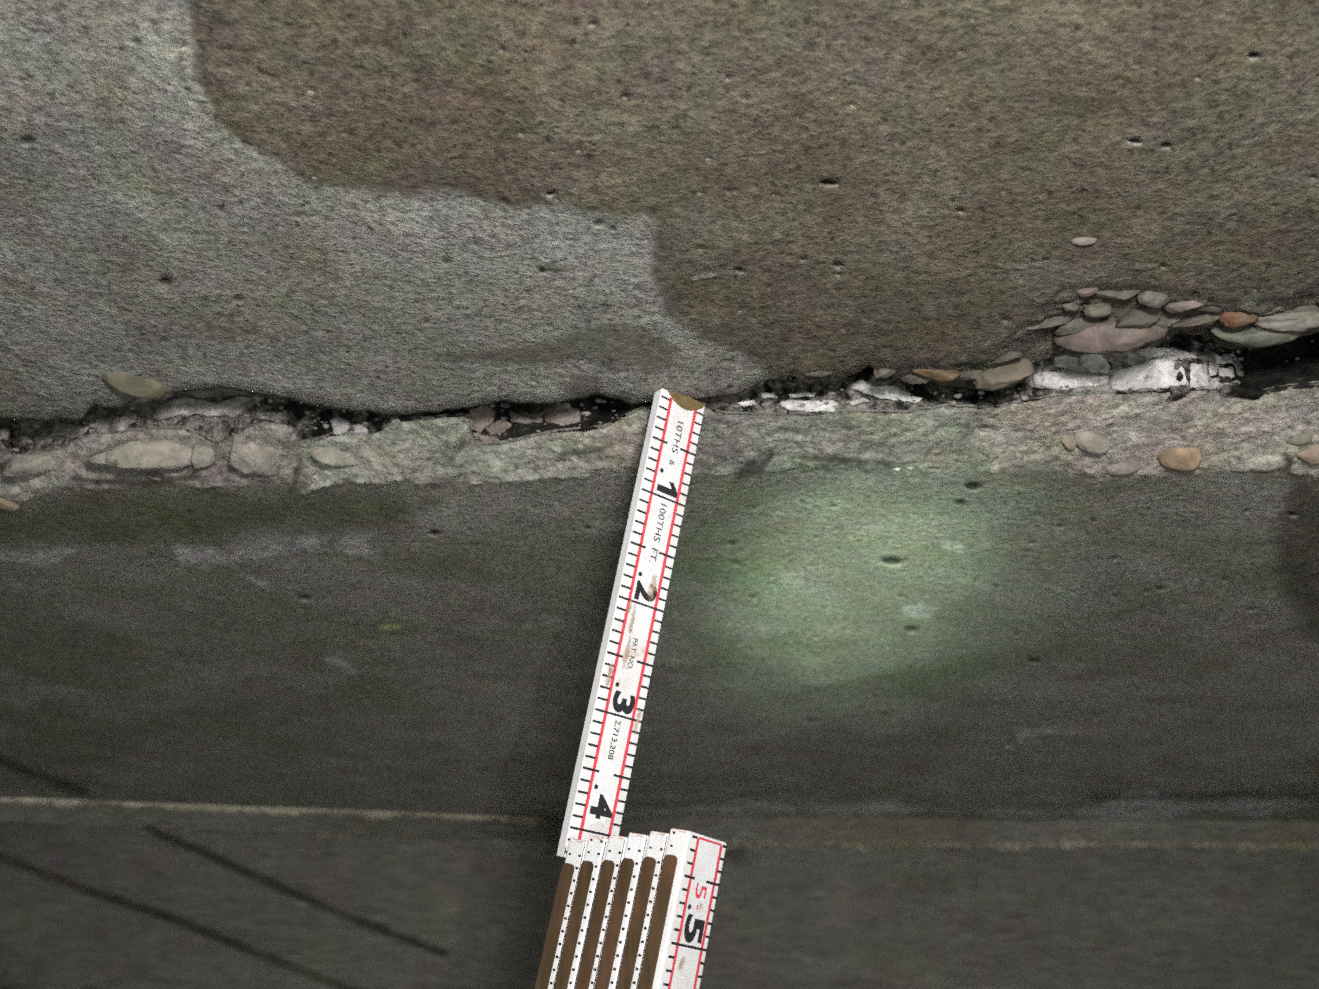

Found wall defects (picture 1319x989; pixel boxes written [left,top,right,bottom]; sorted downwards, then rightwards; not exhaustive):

crack [697,358,1078,417]
spalling [803,281,1319,391]
crack [1106,331,1319,402]
crack [73,474,198,486]
crack [0,390,653,475]
crack [741,450,773,475]
crack [811,456,880,464]
spalling [690,384,1319,486]
leakage [1279,474,1319,632]